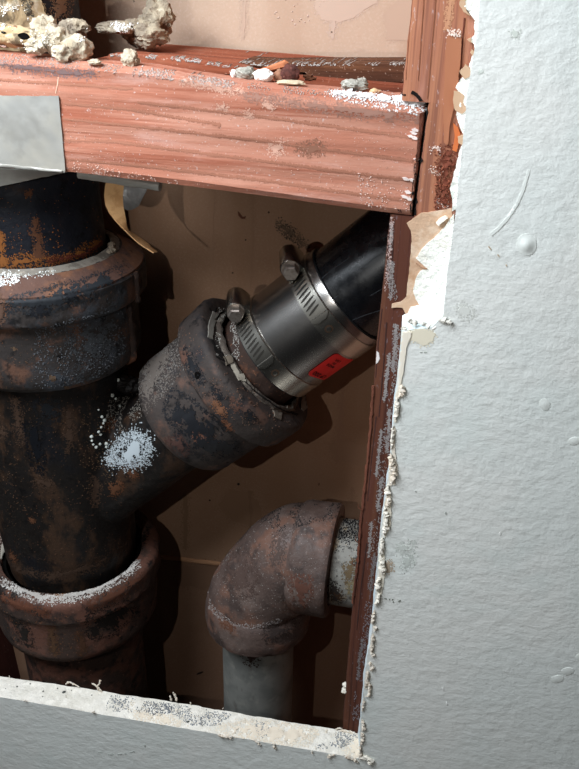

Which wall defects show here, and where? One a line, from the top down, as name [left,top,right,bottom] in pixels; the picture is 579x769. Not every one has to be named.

peeling [384,331,411,537]